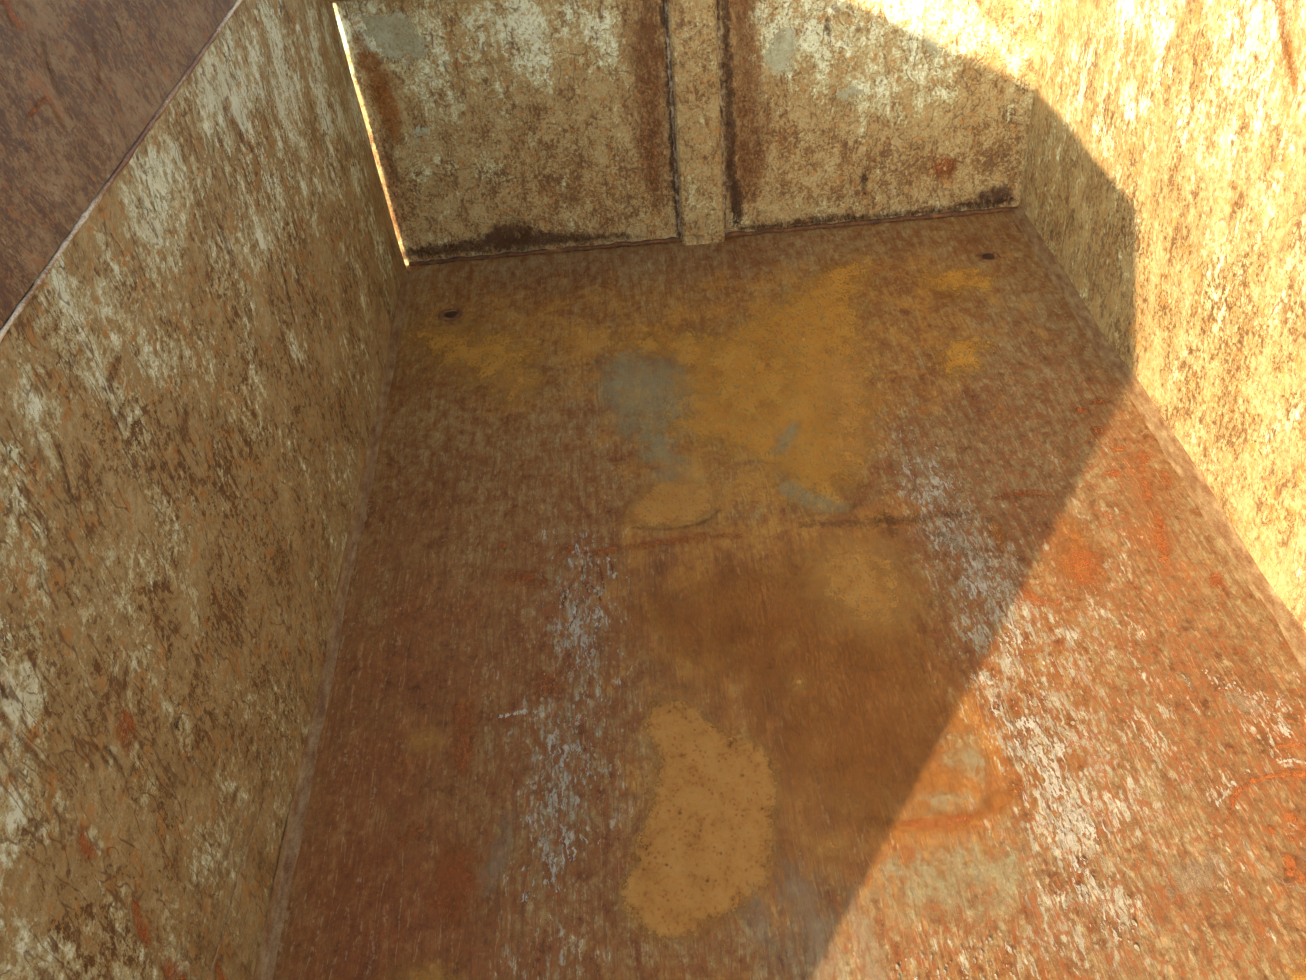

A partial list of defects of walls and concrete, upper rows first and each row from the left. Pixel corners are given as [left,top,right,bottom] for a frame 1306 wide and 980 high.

corrosion [355,38,402,227]
corrosion [721,0,769,226]
corrosion [935,338,991,380]
peeling [498,525,638,903]
corrosion [620,699,779,940]
peeling [885,427,1140,951]